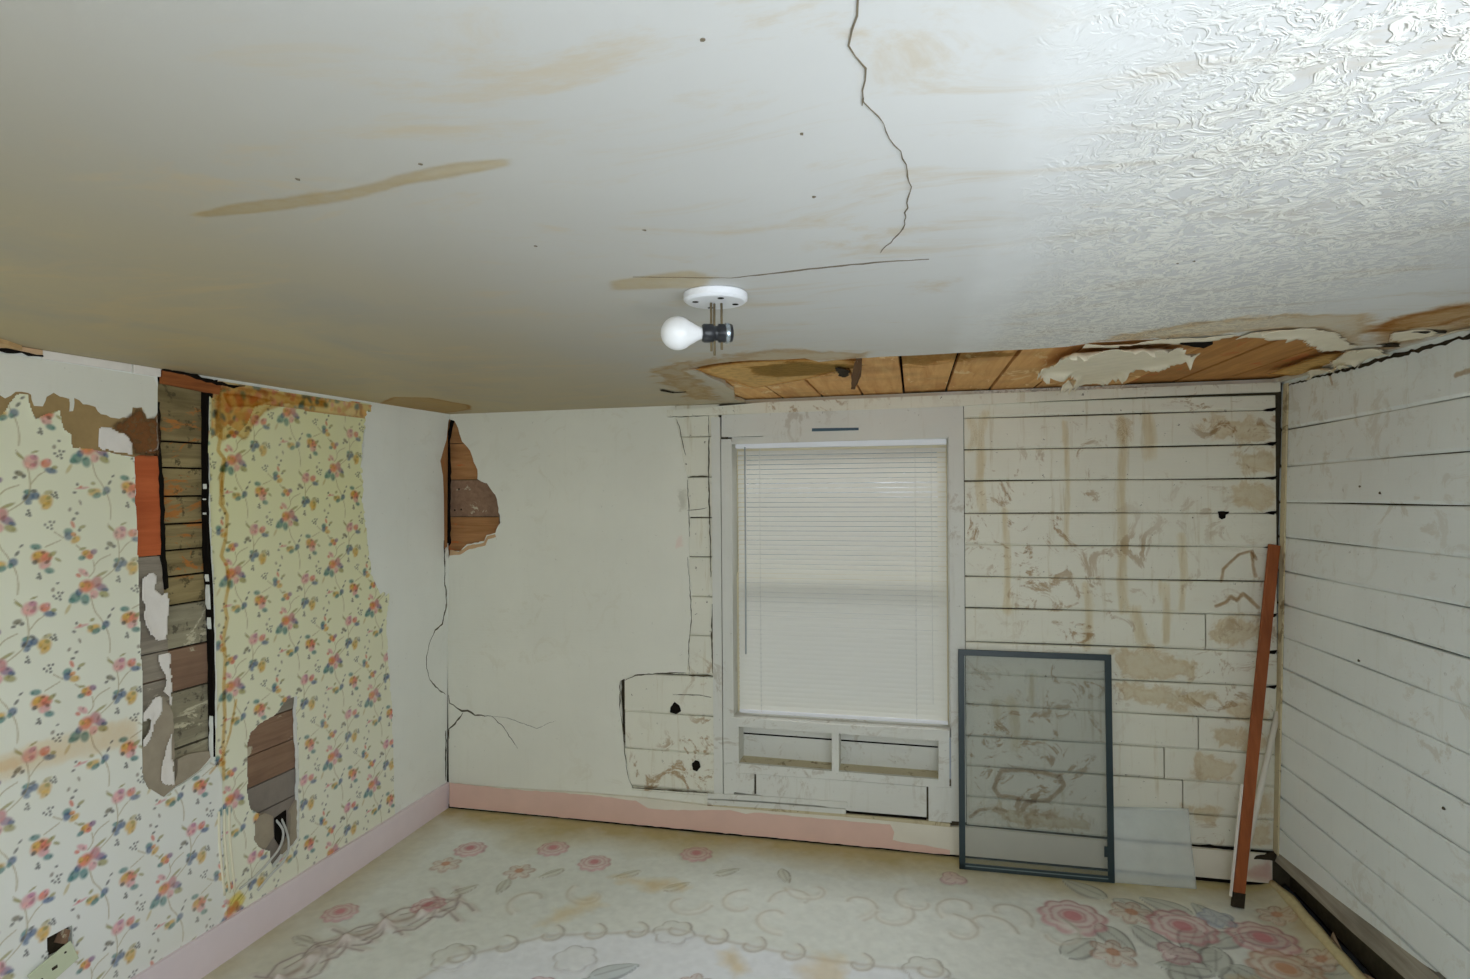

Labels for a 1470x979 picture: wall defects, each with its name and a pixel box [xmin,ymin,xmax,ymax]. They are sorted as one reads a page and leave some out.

crack [647,0,929,278]
spalling [98,382,216,797]
spalling [440,419,500,556]
crack [426,548,551,778]
spalling [247,697,297,864]